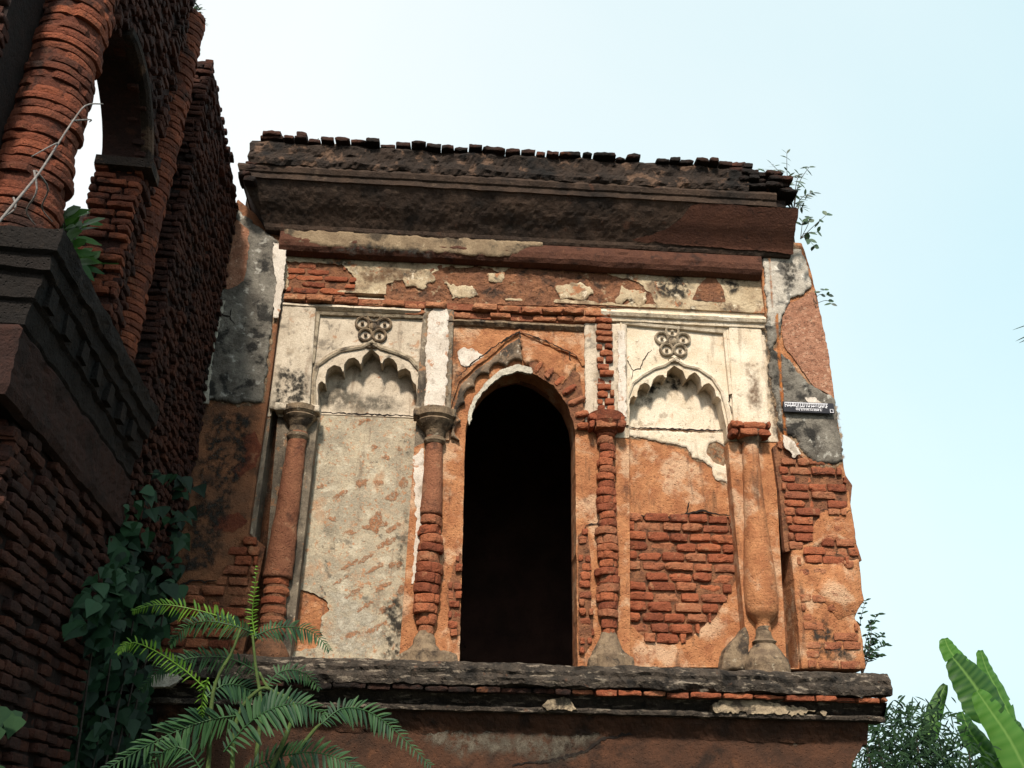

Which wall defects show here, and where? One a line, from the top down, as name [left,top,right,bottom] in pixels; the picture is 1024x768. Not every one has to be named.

peeling [202,210,656,417]
peeling [629,203,862,564]
damp [182,413,250,571]
spalling [156,444,424,657]
spalling [629,512,735,645]